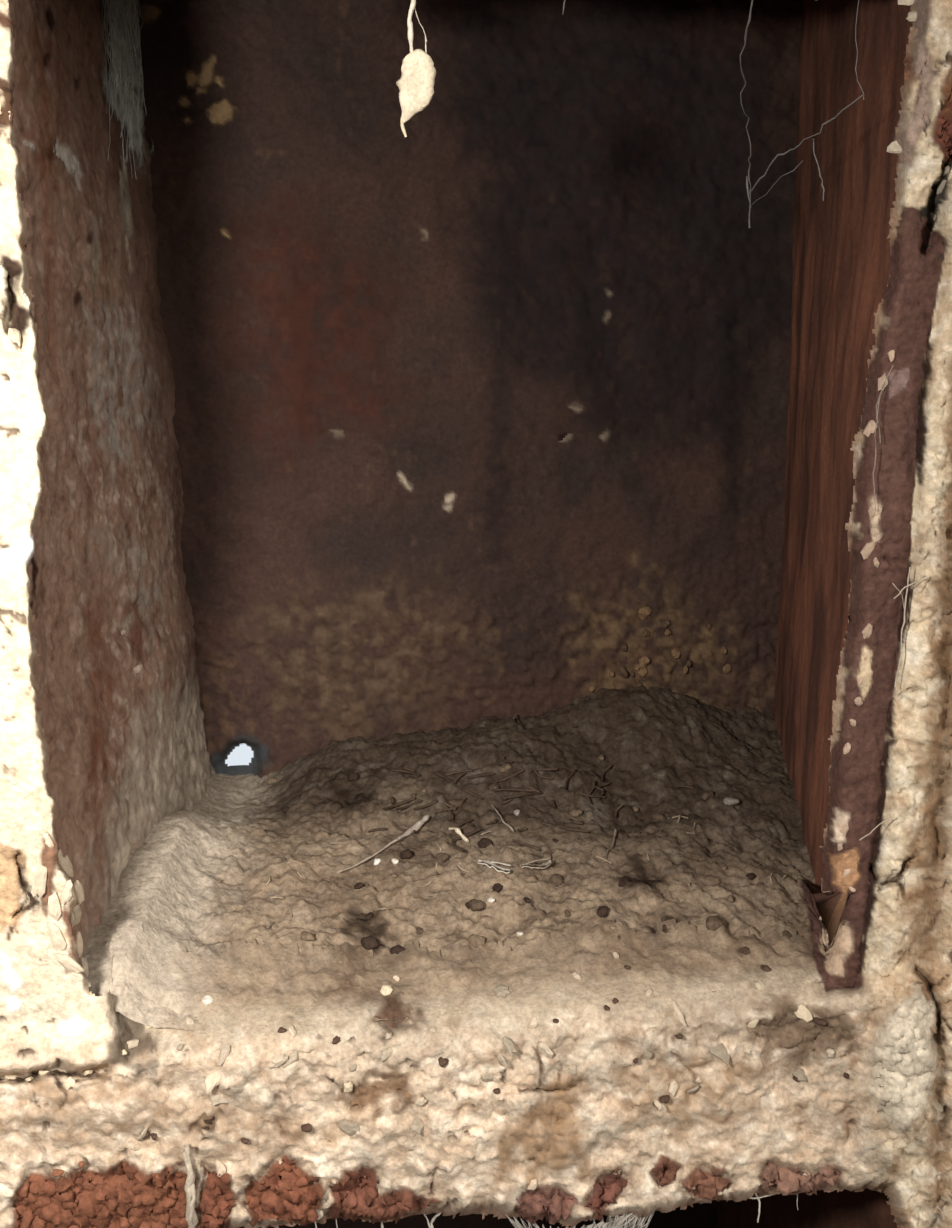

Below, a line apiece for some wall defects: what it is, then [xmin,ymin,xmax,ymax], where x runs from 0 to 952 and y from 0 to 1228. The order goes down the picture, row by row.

flaking render [887,0,952,165]
flaking render [0,833,89,978]
crack [872,859,912,899]
crack [0,1070,106,1110]